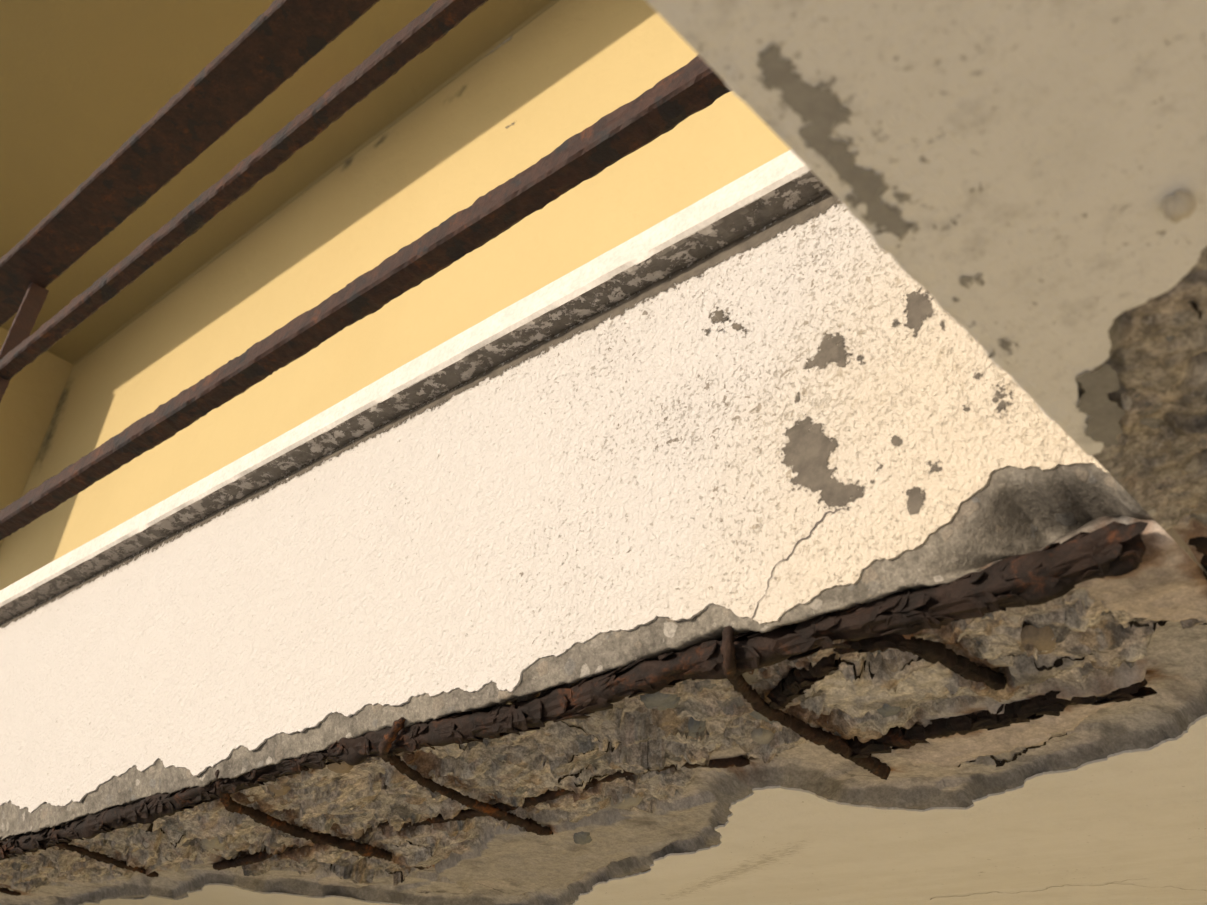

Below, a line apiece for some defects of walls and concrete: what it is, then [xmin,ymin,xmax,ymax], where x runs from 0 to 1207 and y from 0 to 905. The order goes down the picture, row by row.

peeling [0,44,936,628]
spalling [0,247,1207,905]